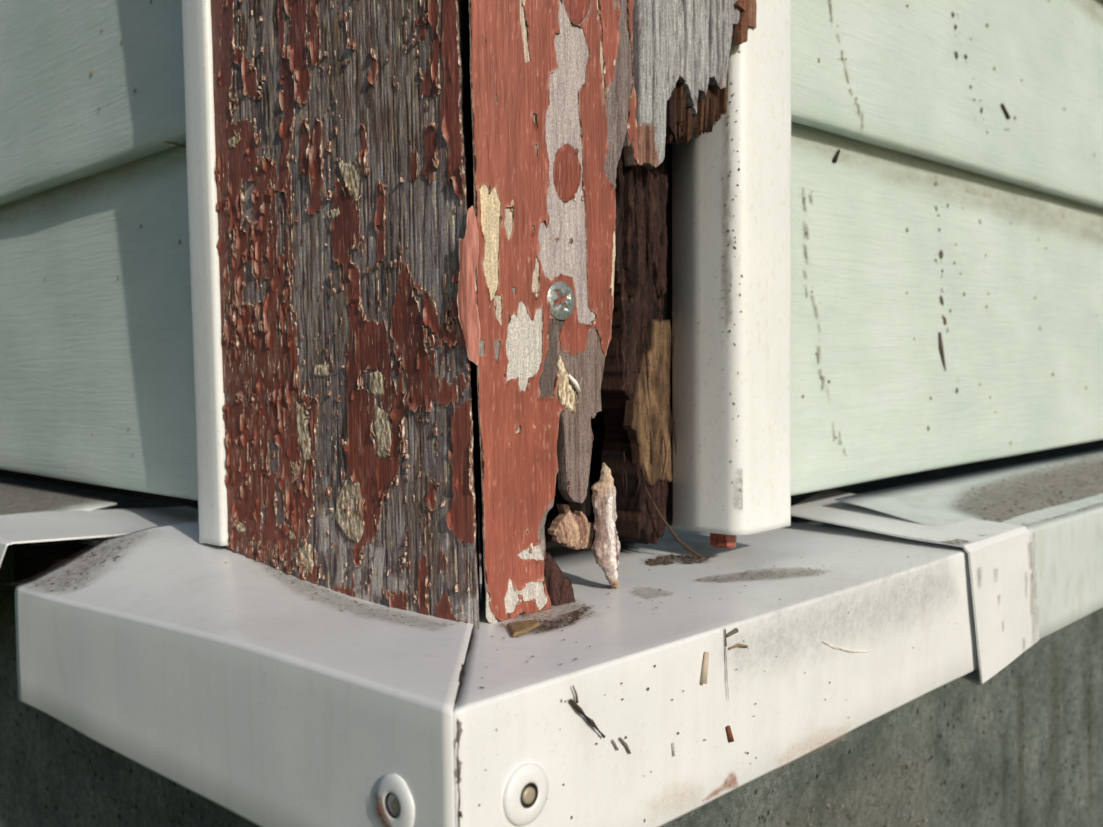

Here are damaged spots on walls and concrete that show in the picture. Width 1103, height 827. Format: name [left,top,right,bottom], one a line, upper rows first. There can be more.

peeling [210,0,632,623]
peeling [733,0,750,46]